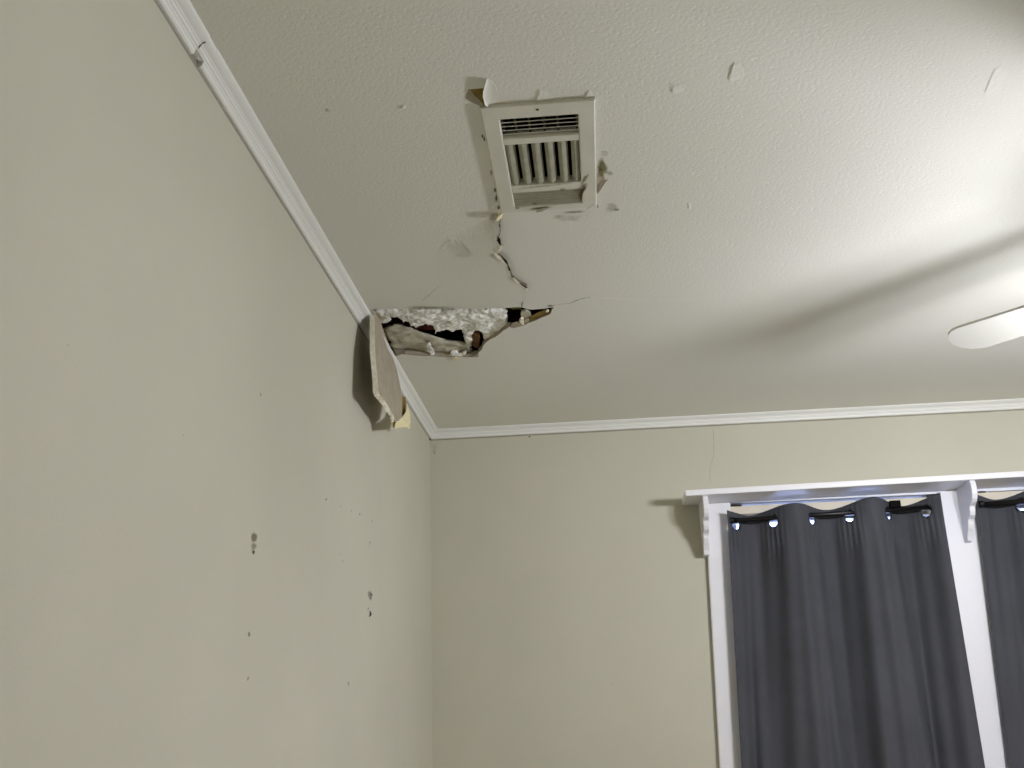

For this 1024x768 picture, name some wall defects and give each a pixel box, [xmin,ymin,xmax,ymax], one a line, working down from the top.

peeling [465,79,498,107]
crack [491,219,528,307]